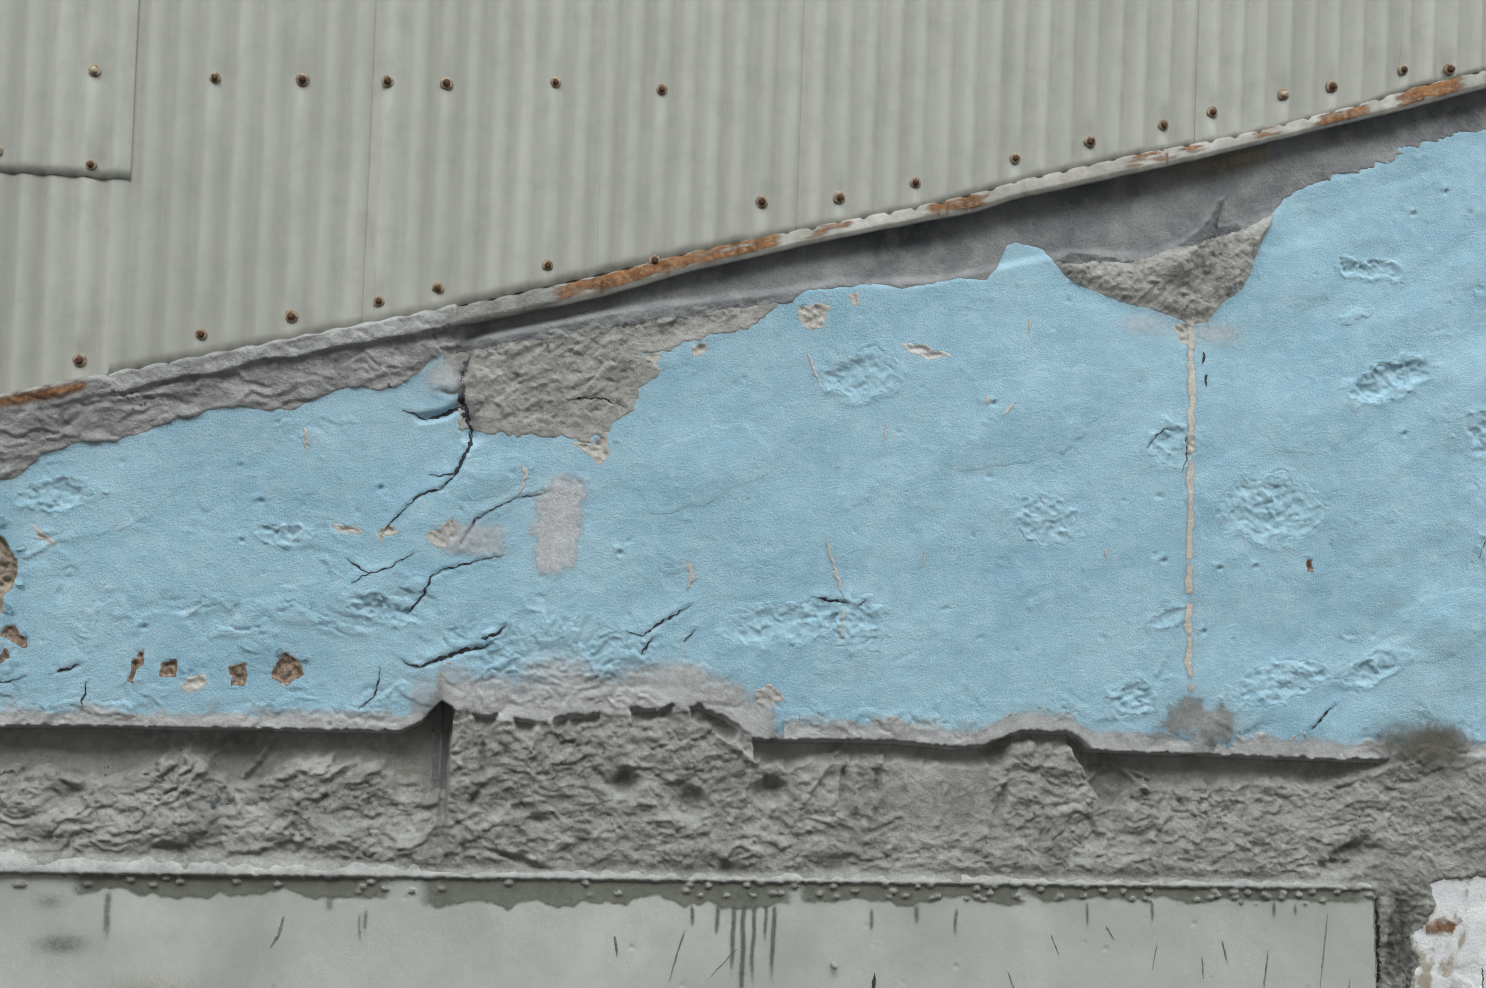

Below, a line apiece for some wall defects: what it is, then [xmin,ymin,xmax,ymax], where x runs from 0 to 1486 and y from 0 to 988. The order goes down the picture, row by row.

rust [1317,105,1370,125]
rust [1397,77,1463,105]
rust [929,195,987,212]
rust [554,235,779,299]
flaking render [429,89,1486,470]
crack [348,356,546,614]
crack [1148,315,1208,691]
flaking render [0,475,109,663]
hole [714,588,892,658]
peeling [127,650,209,694]
peeling [228,662,248,686]
crack [358,626,505,709]